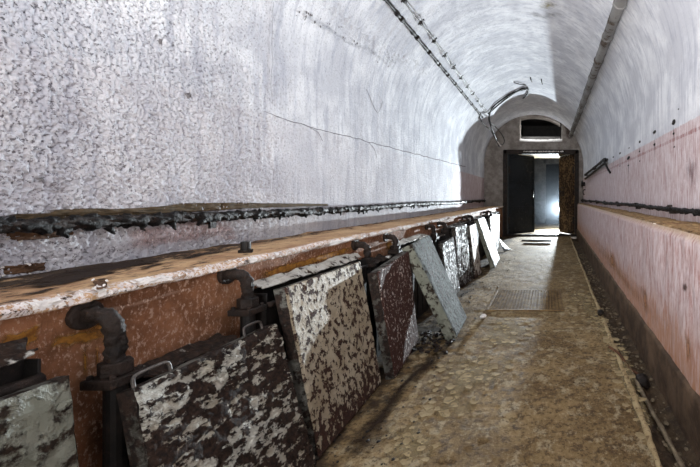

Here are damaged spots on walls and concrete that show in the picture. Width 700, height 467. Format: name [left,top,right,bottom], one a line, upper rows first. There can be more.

crack [270,113,466,167]
peeling [316,229,388,247]
spalling [0,262,48,277]
peeling [23,267,217,311]